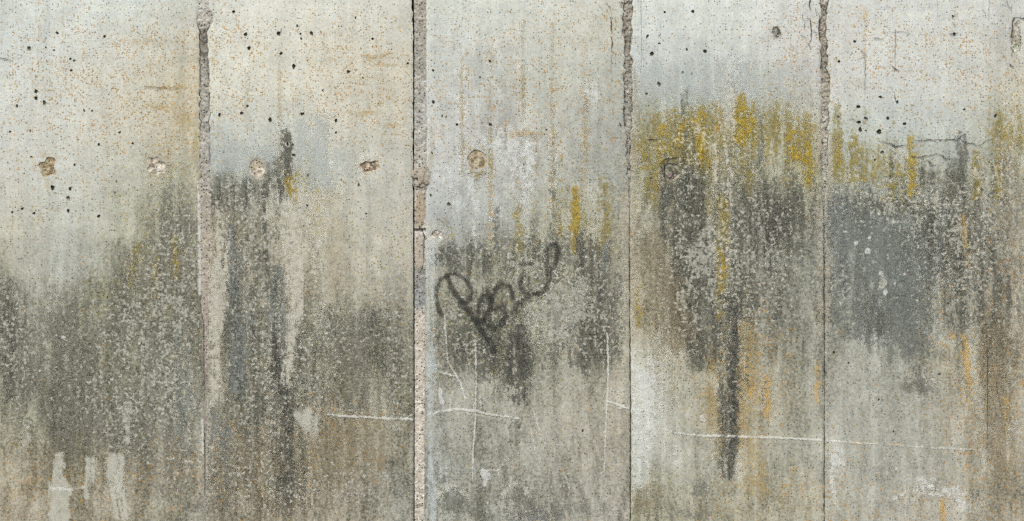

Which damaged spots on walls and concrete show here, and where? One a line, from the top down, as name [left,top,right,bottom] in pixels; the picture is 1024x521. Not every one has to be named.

spalling [38,157,56,177]
spalling [147,156,166,176]
spalling [249,158,265,179]
spalling [359,160,380,173]
spalling [467,149,493,179]
crack [879,134,991,169]
leakage [429,171,623,408]
leakage [644,72,1023,480]
leakage [0,129,409,514]